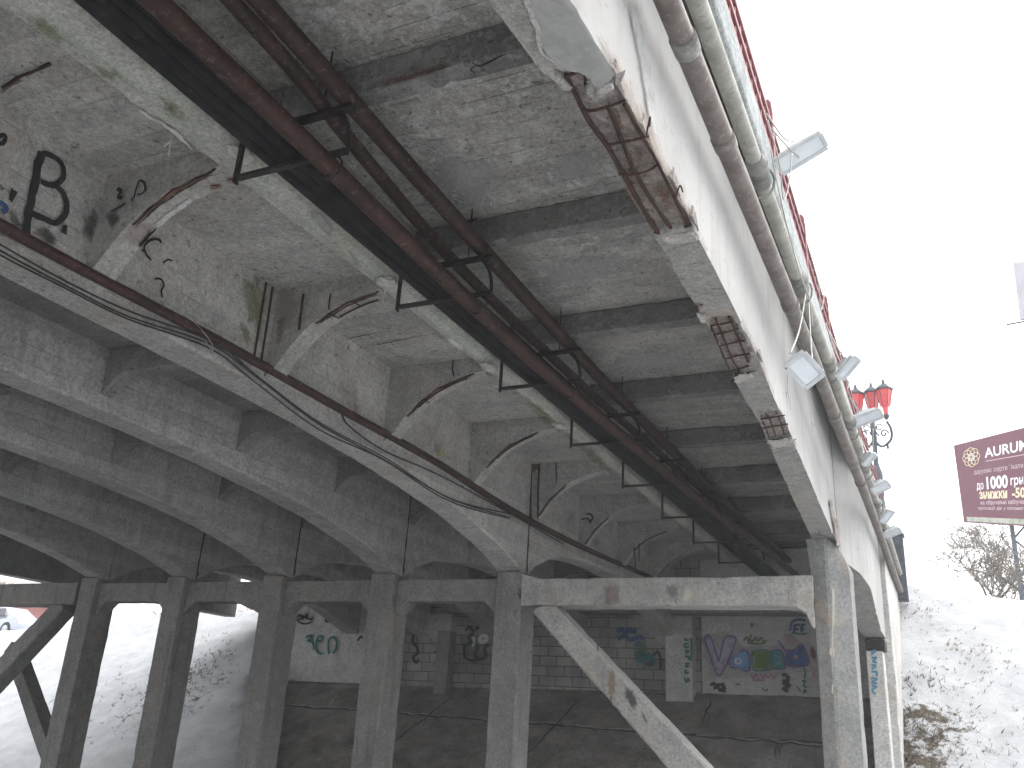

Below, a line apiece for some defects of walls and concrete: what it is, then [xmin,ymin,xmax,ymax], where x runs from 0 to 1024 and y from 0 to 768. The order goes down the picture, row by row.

spalling [524,0,708,252]
spalling [697,313,767,384]
spalling [757,410,797,450]